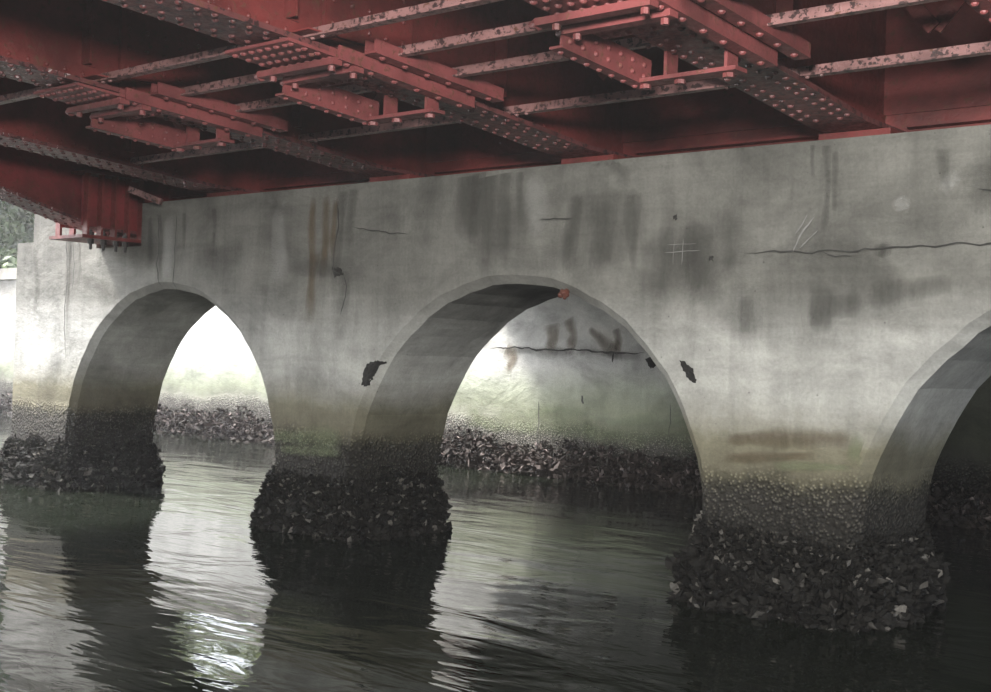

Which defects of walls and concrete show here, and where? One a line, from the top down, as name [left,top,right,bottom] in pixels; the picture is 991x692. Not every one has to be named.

crack [758,242,991,257]
spalling [679,360,697,383]